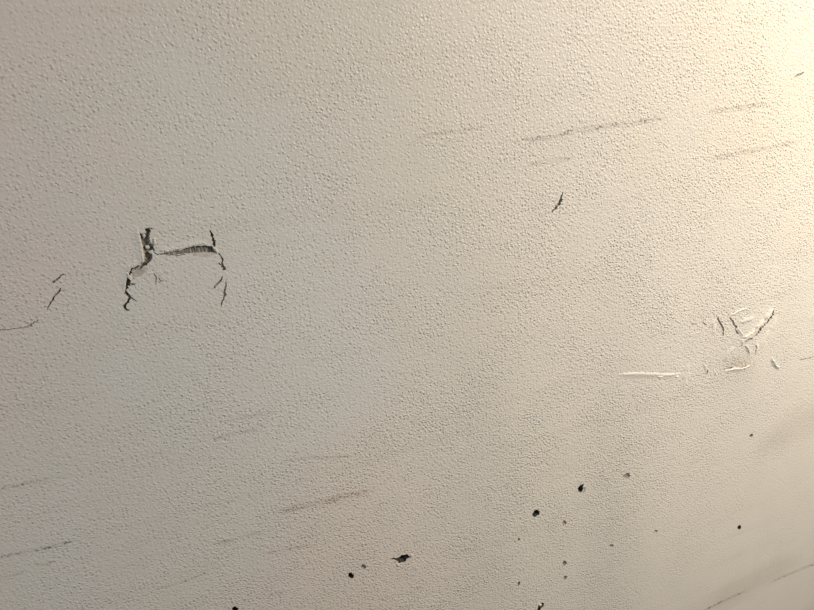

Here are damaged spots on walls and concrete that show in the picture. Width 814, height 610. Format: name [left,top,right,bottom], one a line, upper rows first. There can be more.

crack [0,274,64,331]
crack [118,225,227,311]